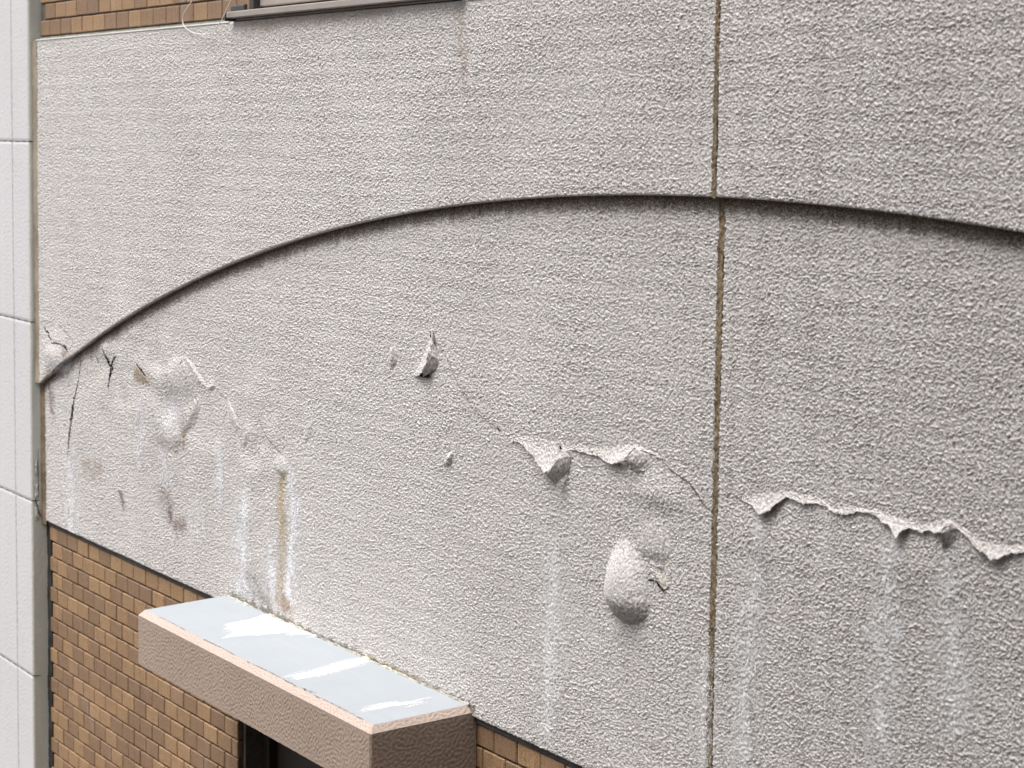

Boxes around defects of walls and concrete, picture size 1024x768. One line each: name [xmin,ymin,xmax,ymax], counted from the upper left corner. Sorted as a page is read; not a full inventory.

crack [44,320,145,455]
peeling [412,330,439,378]
peeling [510,432,661,485]
water stain [132,392,310,619]
peeling [742,489,1024,561]